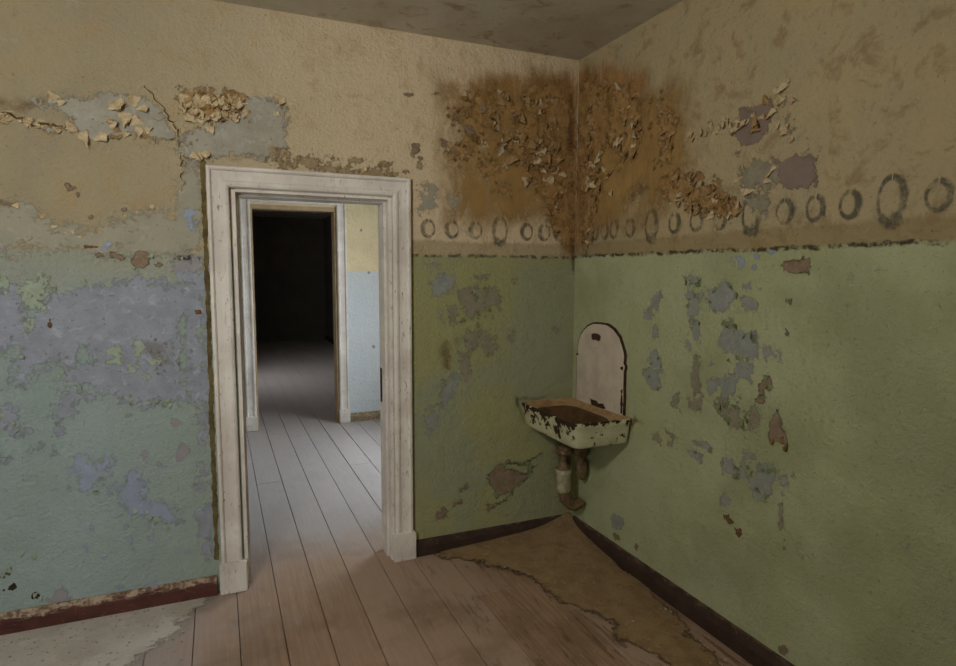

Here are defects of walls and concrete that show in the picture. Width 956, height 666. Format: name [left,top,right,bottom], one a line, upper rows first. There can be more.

peeling [411,180,461,217]
water stain [440,68,685,252]
peeling [0,84,424,560]
peeling [424,262,516,382]
peeling [642,291,663,390]
peeling [781,256,811,275]
peeling [670,274,796,551]
spalling [485,460,533,512]